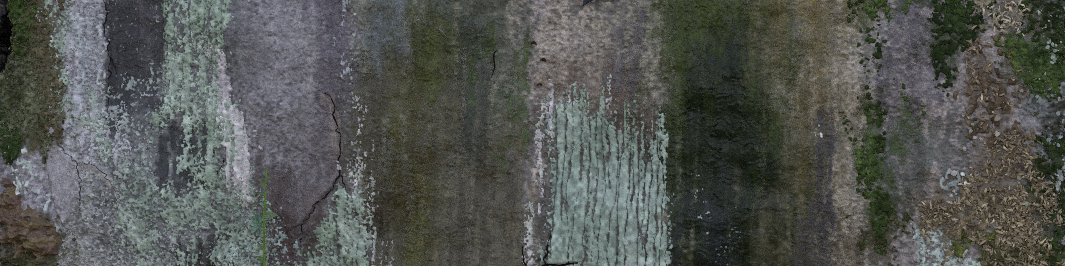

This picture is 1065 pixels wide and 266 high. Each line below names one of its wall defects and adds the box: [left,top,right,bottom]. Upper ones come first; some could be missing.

crack [300,93,346,243]
water stain [569,0,891,266]
crack [522,231,578,266]